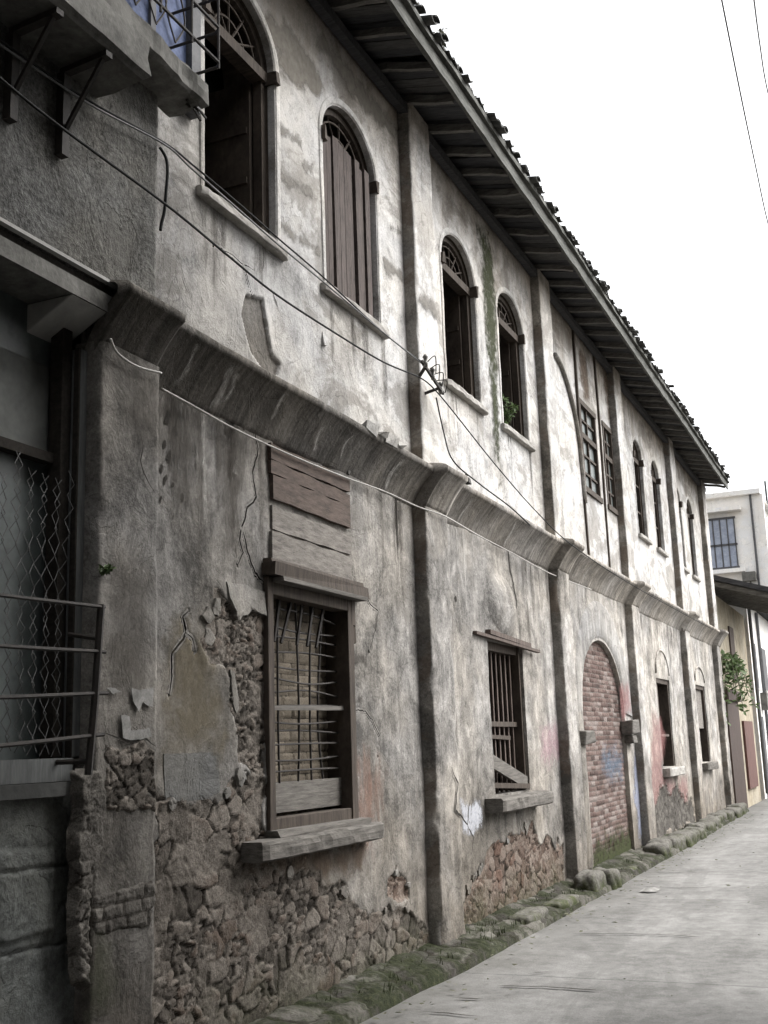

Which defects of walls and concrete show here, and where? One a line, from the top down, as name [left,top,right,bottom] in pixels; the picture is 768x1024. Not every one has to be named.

crack [236,433,264,584]
crack [168,608,197,695]
spalling [152,582,429,1024]
spalling [655,785,695,838]
spalling [463,821,564,924]